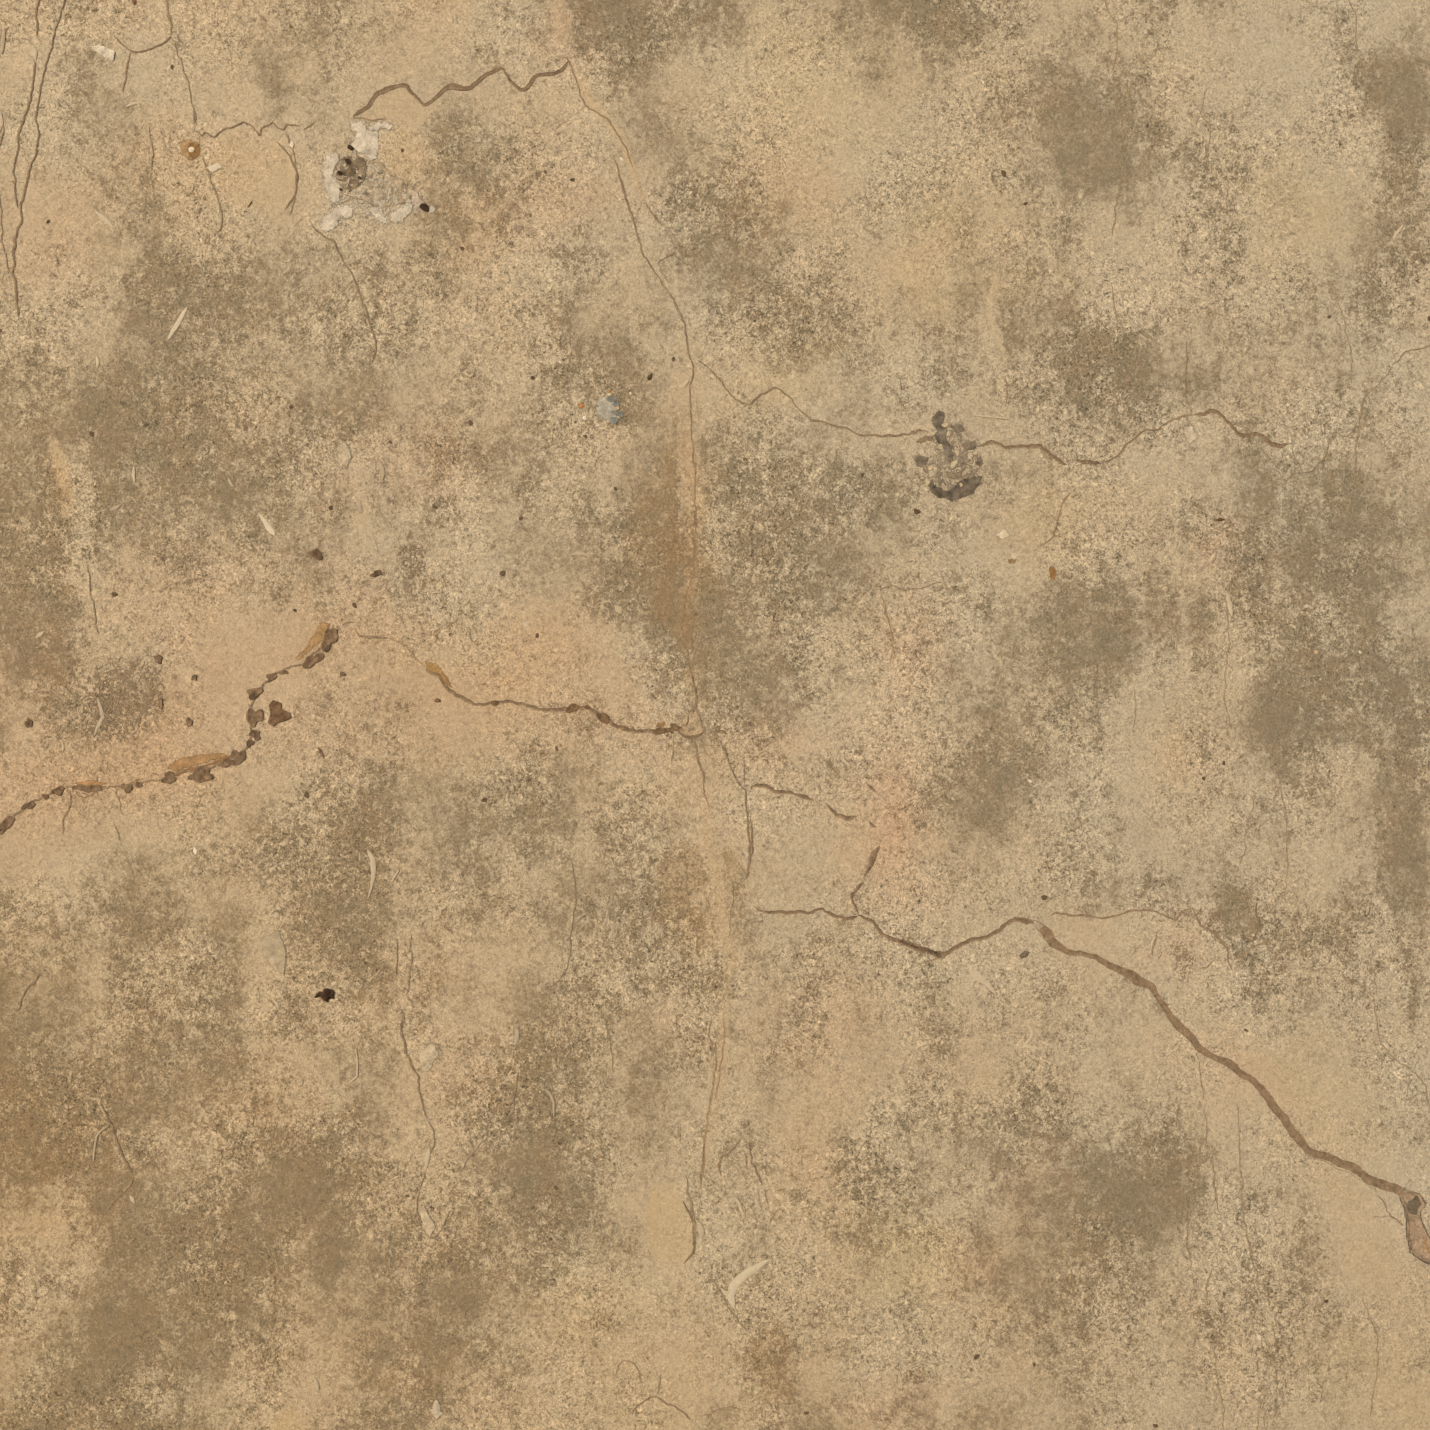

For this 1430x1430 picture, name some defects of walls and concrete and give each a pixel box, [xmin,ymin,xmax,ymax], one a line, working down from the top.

crack [0,0,65,317]
peeling [208,85,440,232]
crack [1105,0,1126,236]
crack [87,567,98,633]
crack [307,549,322,560]
crack [0,621,679,874]
crack [352,56,1430,1333]
crack [100,1103,163,1214]
crack [615,1360,744,1421]
crack [1213,1333,1225,1430]
crack [1249,1316,1279,1430]
crack [1362,1294,1379,1418]